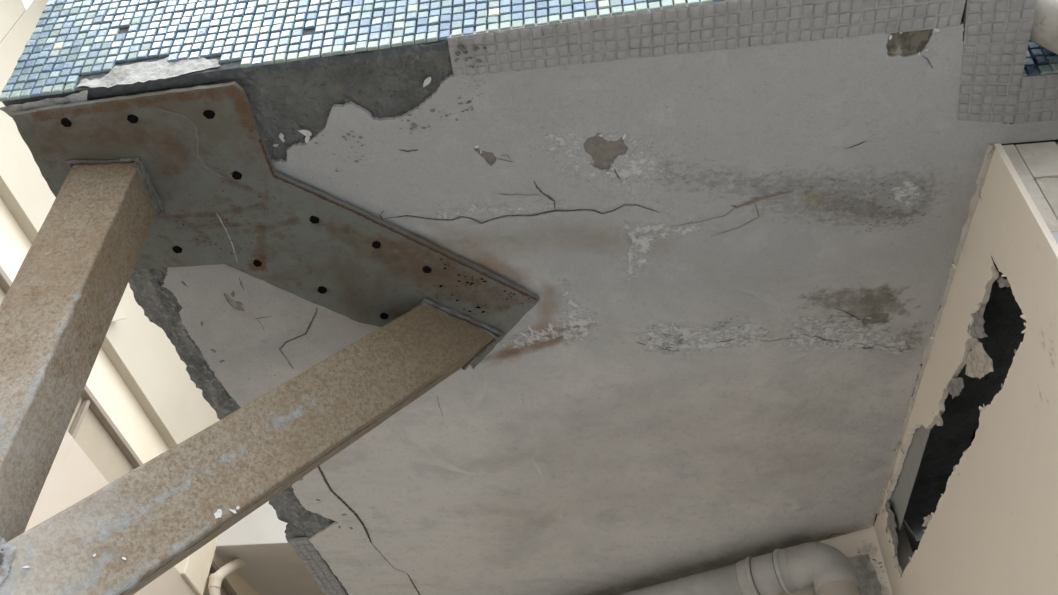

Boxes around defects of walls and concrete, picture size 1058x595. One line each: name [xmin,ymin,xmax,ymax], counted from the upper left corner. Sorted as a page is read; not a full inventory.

spalling [92,40,487,163]
rust [164,88,538,301]
crack [380,180,791,236]
spalling [583,133,628,180]
leakage [535,91,926,232]
spalling [886,28,940,56]
spalling [129,267,244,420]
peeling [875,144,996,578]
spalling [269,485,353,543]
crack [317,466,421,595]